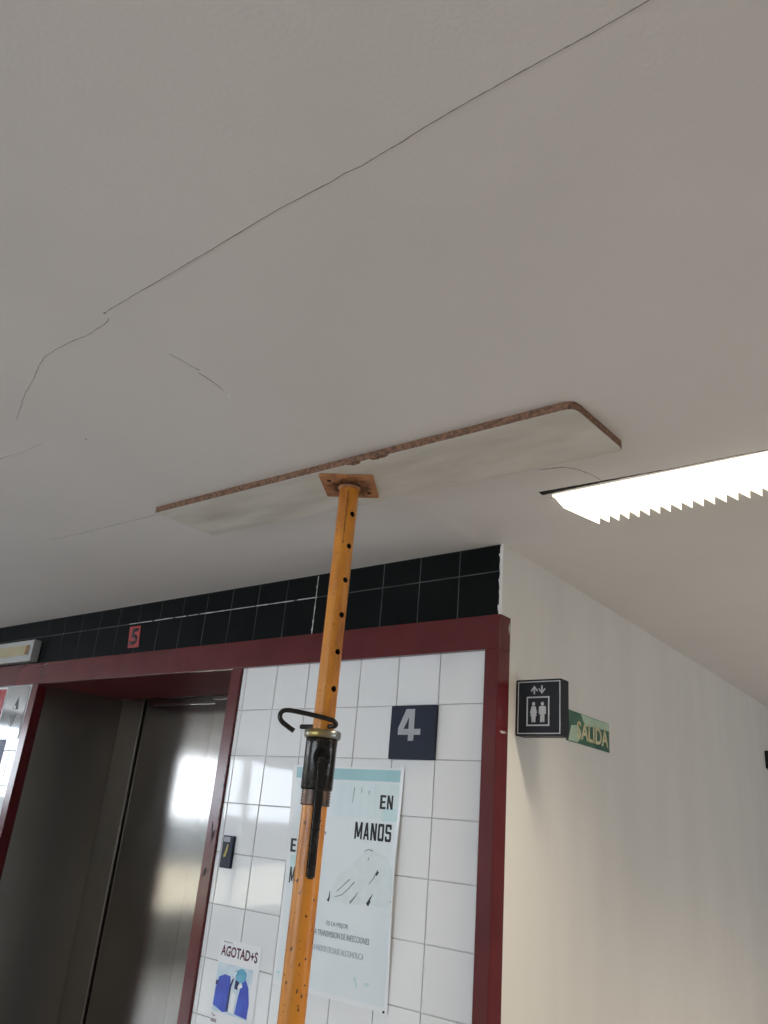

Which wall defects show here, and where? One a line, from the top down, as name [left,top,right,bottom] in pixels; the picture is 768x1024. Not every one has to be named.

crack [17,0,649,417]